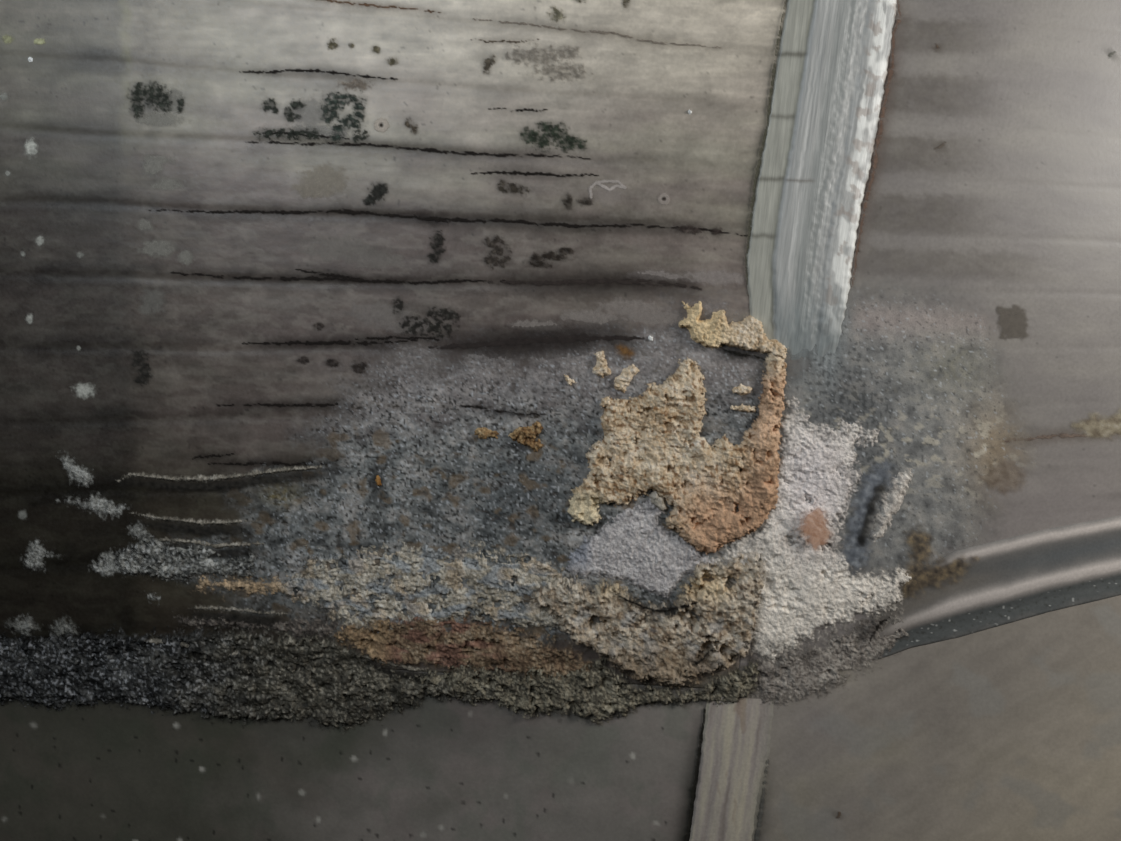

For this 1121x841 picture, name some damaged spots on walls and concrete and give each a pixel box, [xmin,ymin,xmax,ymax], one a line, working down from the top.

damp [131,82,184,118]
damp [253,80,367,143]
crack [149,0,787,285]
crack [242,336,439,346]
crack [218,400,364,408]
crack [455,405,545,416]
peeling [116,465,322,491]
damp [56,456,147,539]
corrosion [0,295,1020,731]
peeling [132,512,263,557]
damp [24,540,53,570]
peeling [195,605,289,625]